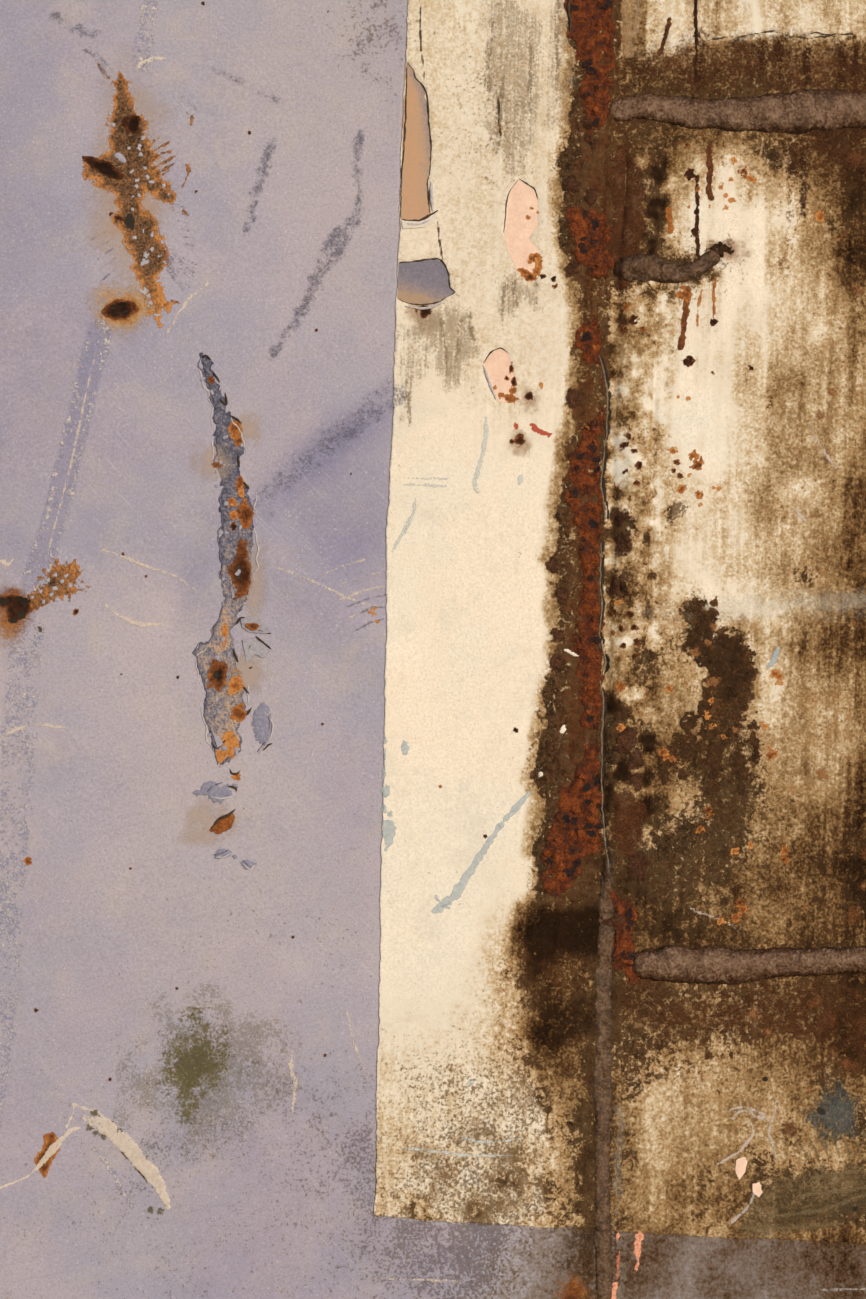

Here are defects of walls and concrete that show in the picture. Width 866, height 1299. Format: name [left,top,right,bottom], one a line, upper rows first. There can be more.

rust [82,50,191,331]
peeling [397,7,455,310]
peeling [503,179,543,283]
rust [566,146,648,334]
rust [665,145,757,259]
peeling [483,347,519,404]
rust [675,276,718,367]
rust [0,586,51,639]
peeling [192,353,271,781]
rust [540,407,647,897]
peeling [209,809,236,834]
spalling [0,1103,105,1189]